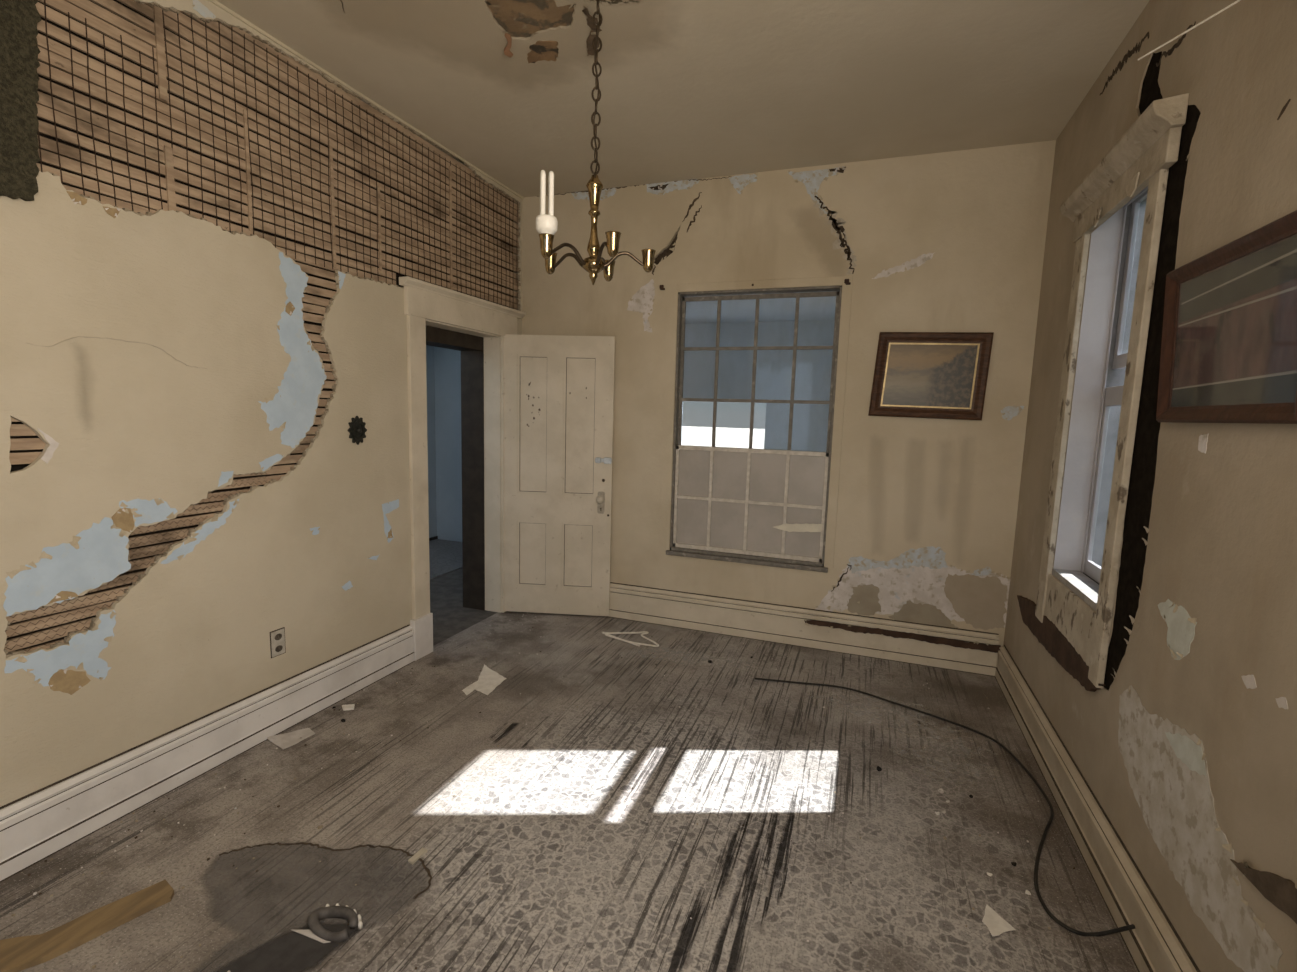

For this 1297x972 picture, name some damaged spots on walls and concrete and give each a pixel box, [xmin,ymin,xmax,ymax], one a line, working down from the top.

spalling [484,0,576,64]
crack [537,176,731,275]
crack [812,196,857,275]
spalling [3,0,521,695]
peeling [804,546,1010,653]